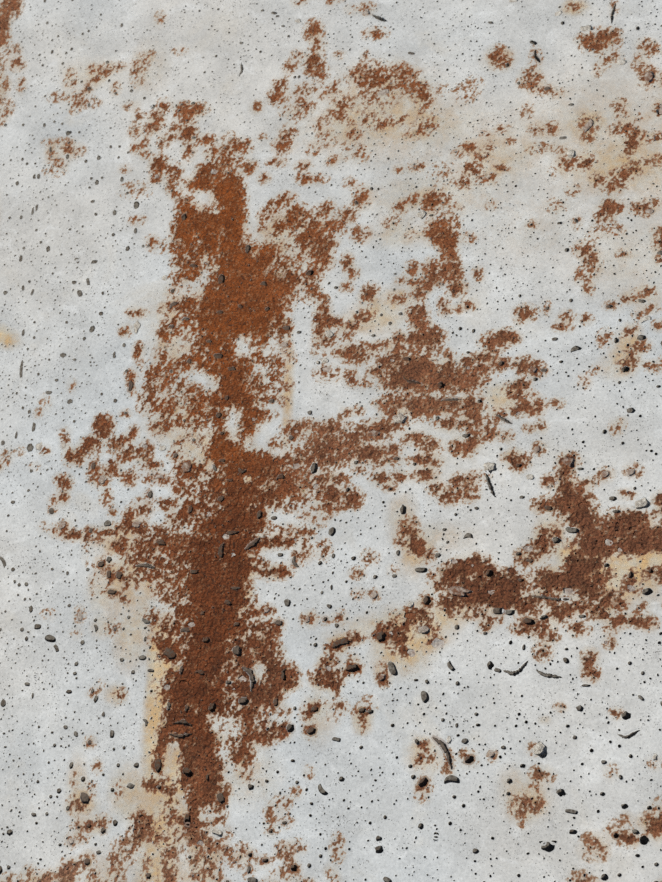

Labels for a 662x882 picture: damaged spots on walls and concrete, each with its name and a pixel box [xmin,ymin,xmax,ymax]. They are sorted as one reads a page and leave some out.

rust [325,0,377,16]
rust [0,0,27,127]
rust [45,49,157,114]
rust [253,17,485,186]
rust [486,43,515,70]
rust [574,25,662,91]
rust [515,45,662,296]
rust [550,310,595,331]
rust [596,284,662,375]
rust [0,97,566,882]
rust [306,450,662,735]
rust [566,796,662,882]